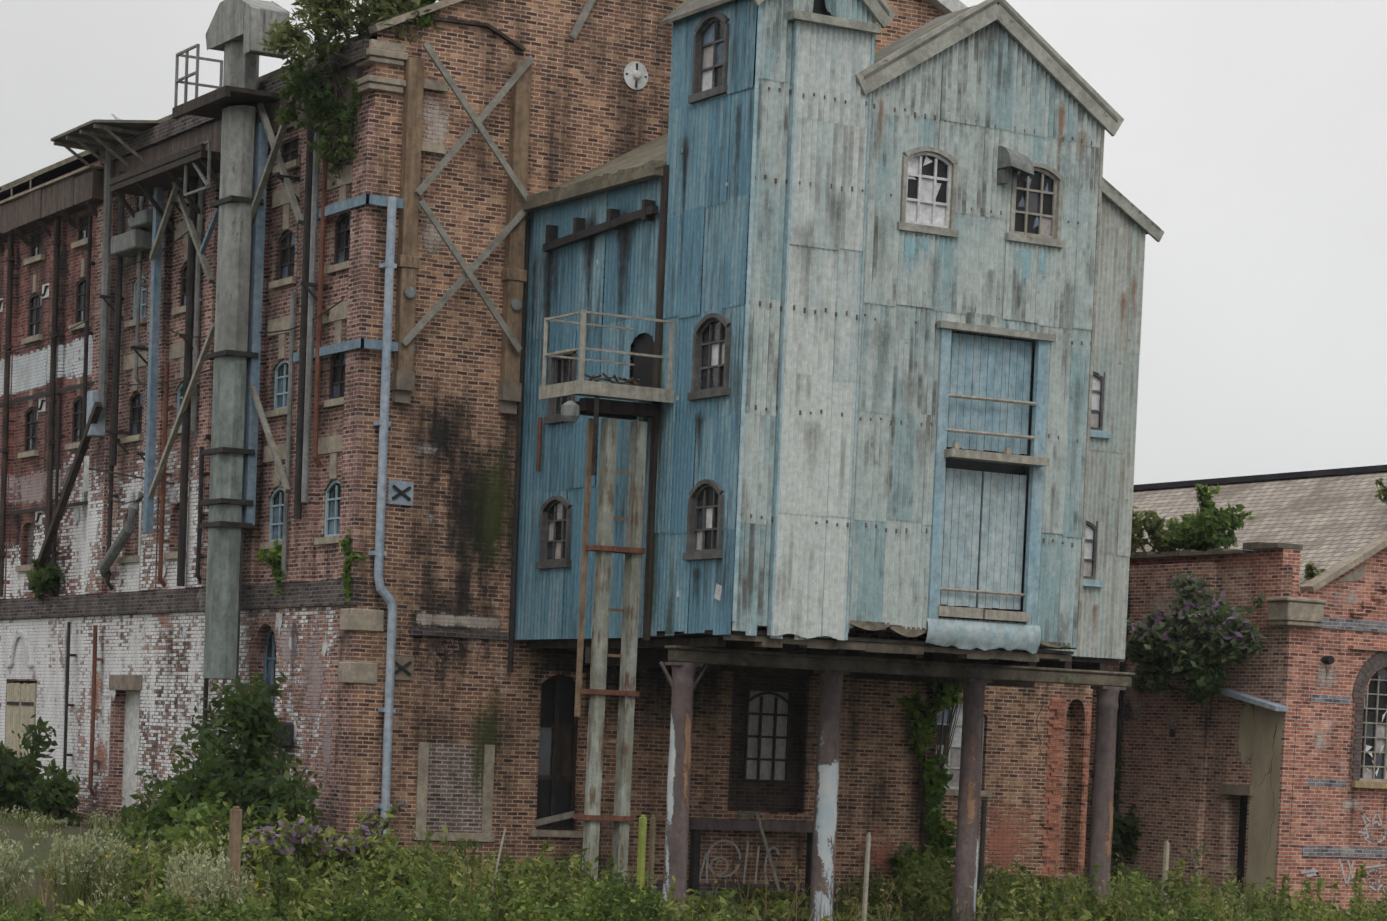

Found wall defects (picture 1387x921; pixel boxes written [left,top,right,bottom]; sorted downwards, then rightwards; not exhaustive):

damp [424,101,448,157]
peeling [0,445,209,599]
peeling [0,606,337,814]
peeling [814,759,839,921]